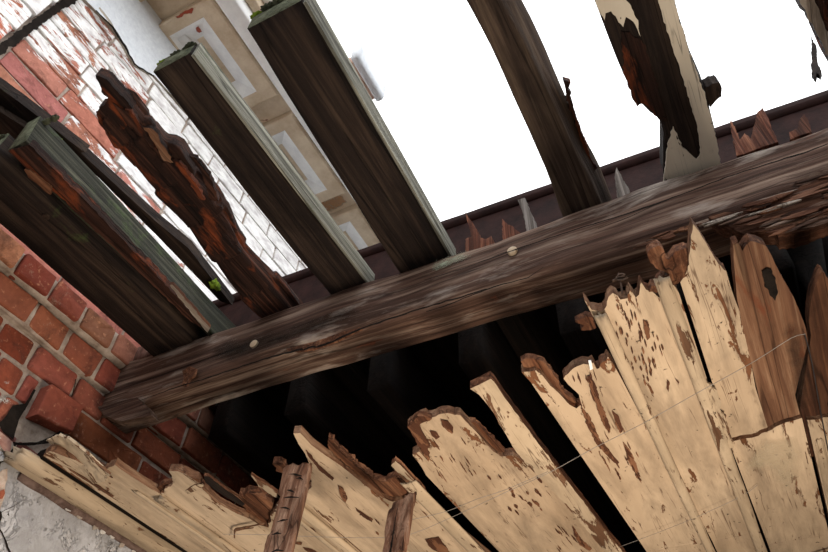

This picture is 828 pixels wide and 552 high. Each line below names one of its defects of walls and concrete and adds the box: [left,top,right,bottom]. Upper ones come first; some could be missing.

spalling [0,389,64,462]
crack [0,443,20,552]